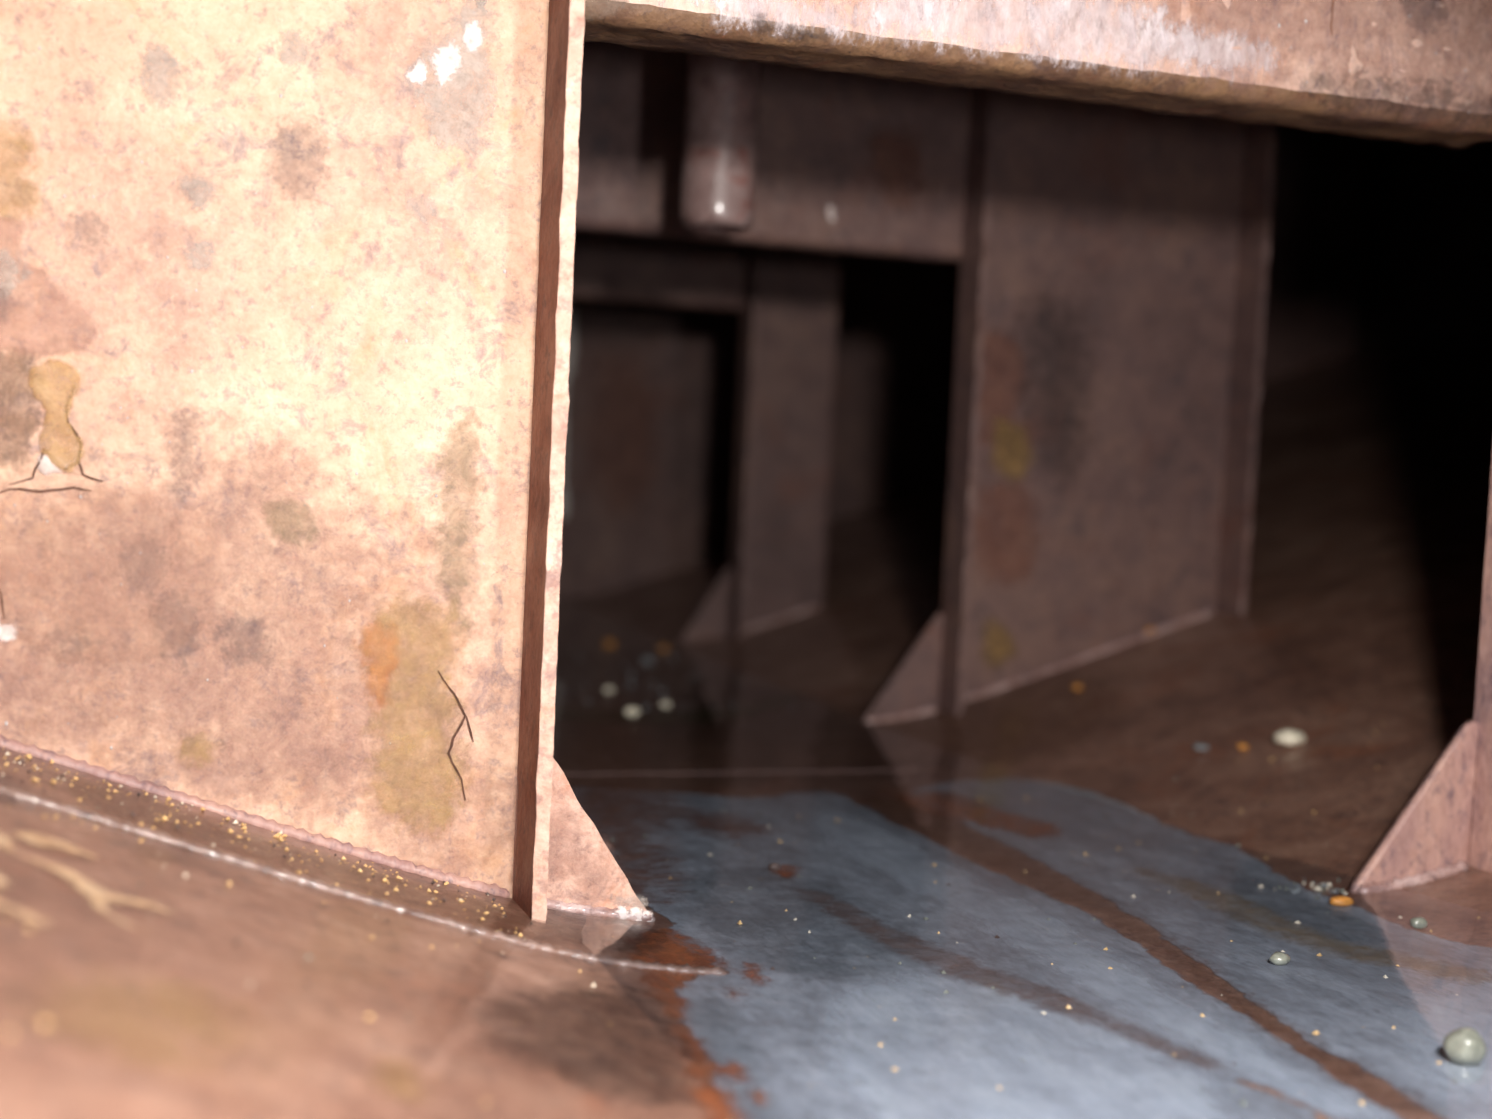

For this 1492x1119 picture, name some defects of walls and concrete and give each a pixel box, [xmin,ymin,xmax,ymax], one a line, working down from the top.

water stain [695,0,1276,71]
peeling [0,353,83,475]
crack [0,389,103,493]
crack [438,671,474,800]
rust [578,786,766,902]
rust [624,929,766,1119]